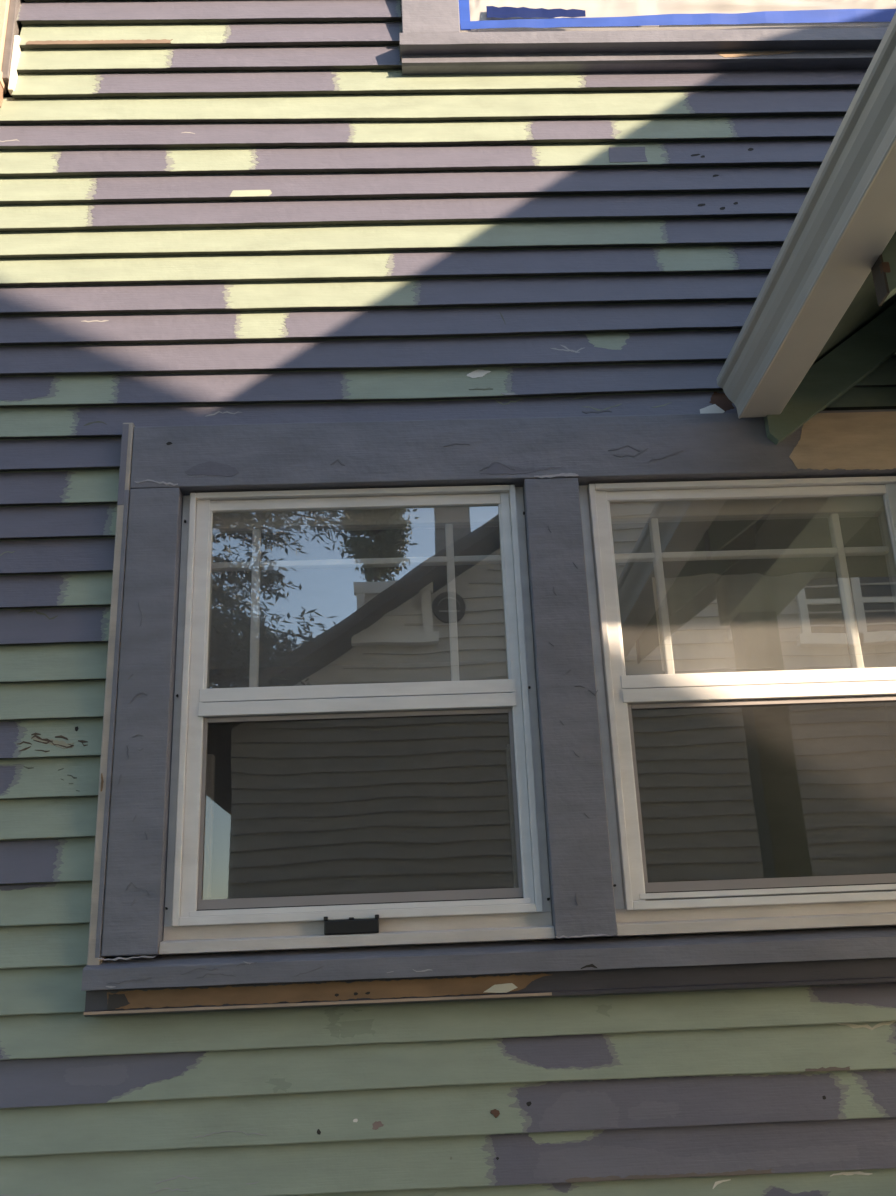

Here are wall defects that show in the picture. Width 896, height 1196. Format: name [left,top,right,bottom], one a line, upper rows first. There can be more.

peeling [106,969,548,1009]